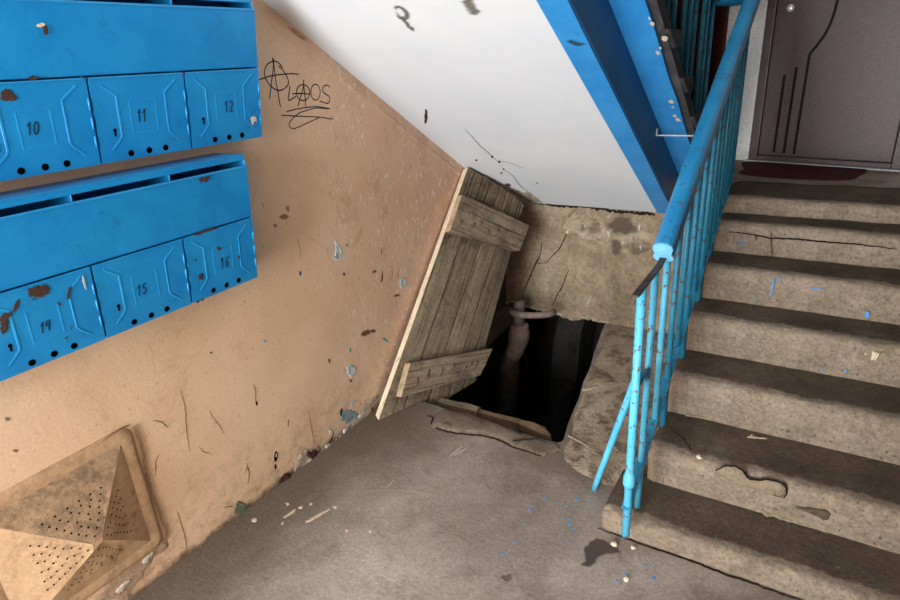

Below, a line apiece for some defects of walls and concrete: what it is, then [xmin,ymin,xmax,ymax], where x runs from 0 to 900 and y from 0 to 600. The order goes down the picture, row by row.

crack [473,138,655,305]
spalling [563,213,656,255]
crack [734,232,893,254]
spalling [274,395,379,483]
crack [427,415,554,486]
water stain [582,538,619,567]